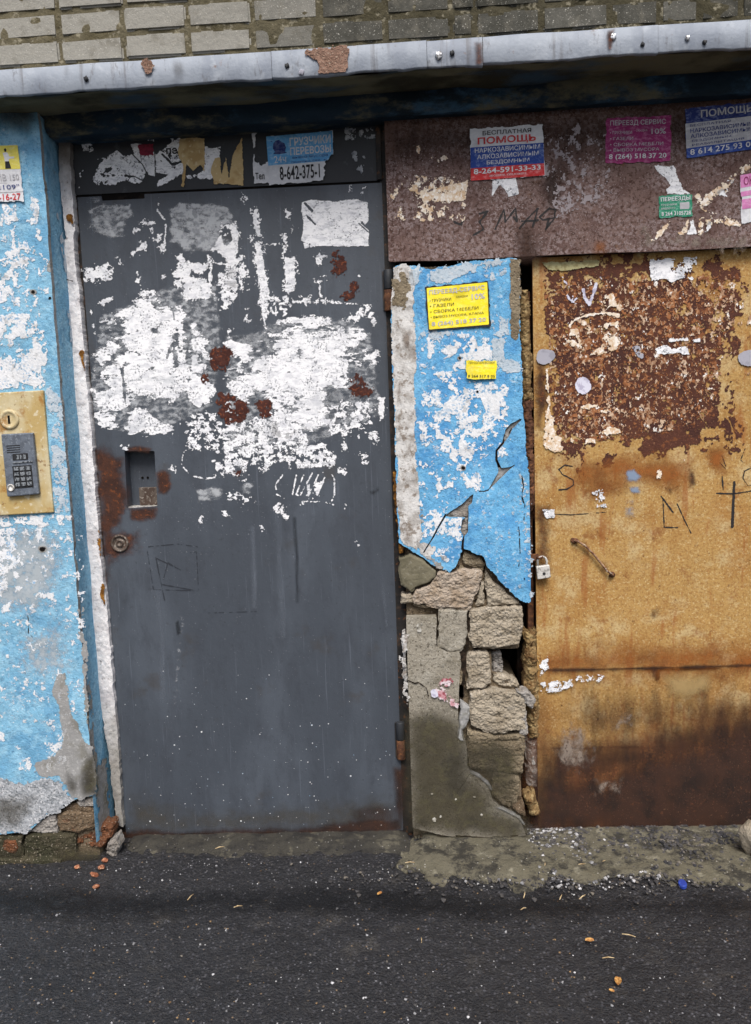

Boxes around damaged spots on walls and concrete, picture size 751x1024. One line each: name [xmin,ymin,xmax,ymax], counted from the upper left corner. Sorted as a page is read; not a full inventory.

rust [201,345,233,385]
rust [215,392,273,425]
rust [348,373,374,399]
rust [537,273,731,443]
spalling [0,197,125,856]
rust [95,450,155,557]
rust [158,471,170,493]
crack [423,514,446,552]
peeling [391,258,604,825]
crack [479,419,525,567]
rust [548,649,751,674]
rust [534,709,751,829]